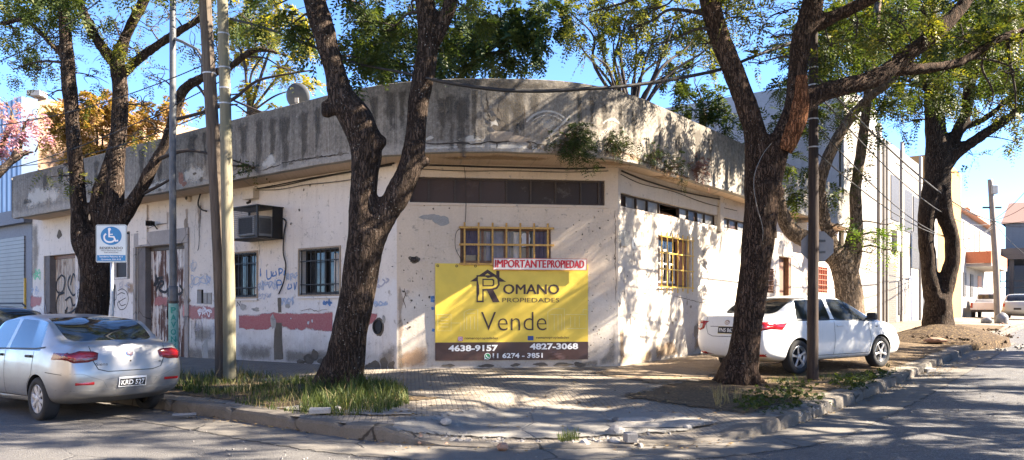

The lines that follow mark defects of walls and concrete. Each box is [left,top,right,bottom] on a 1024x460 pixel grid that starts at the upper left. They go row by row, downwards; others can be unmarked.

leakage [184,132,206,181]
leakage [239,109,320,173]
leakage [369,91,406,125]
leakage [426,80,637,156]